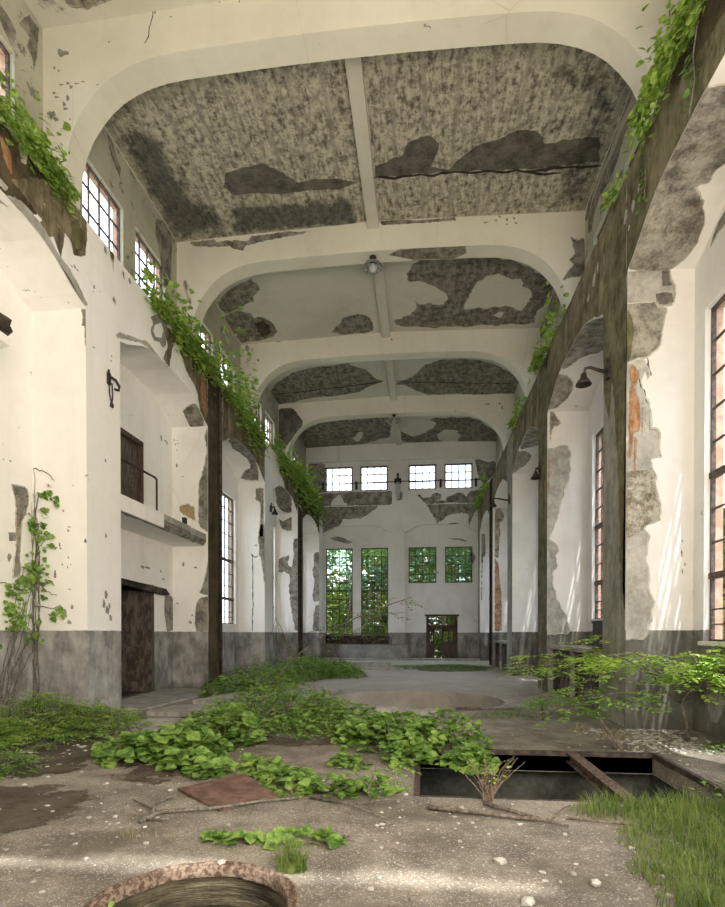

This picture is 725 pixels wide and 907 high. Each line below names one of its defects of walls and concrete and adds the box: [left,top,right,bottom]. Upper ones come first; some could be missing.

peeling [105,59,366,287]
crack [374,165,602,180]
peeling [362,43,632,302]
spalling [0,195,95,348]
peeling [116,314,168,367]
peeling [218,279,281,351]
peeling [332,314,374,335]
peeling [389,246,561,339]
peeling [625,83,725,640]
rust [628,366,643,472]
spalling [547,317,604,635]
spalling [7,484,29,578]